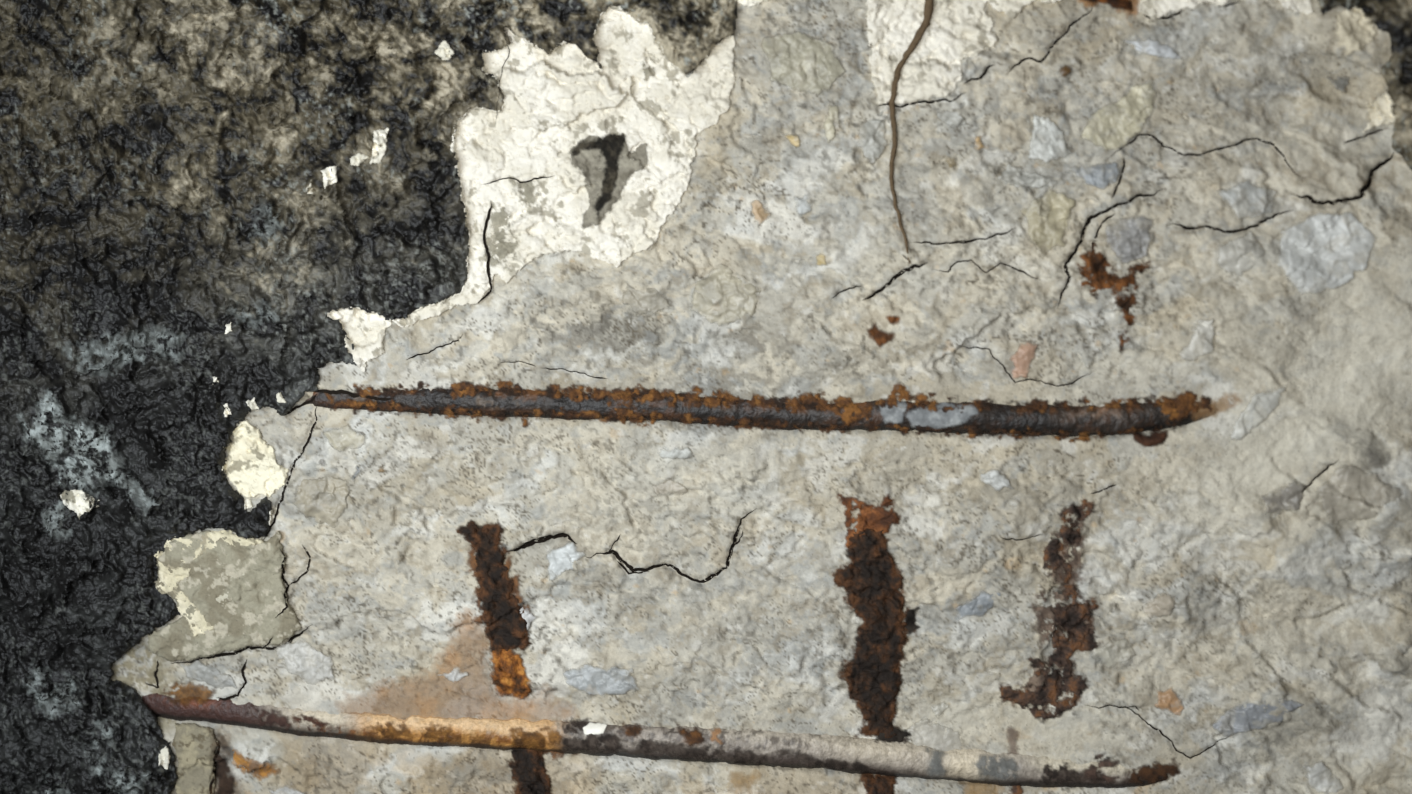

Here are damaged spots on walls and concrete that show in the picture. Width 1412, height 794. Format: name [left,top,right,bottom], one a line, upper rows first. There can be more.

crack [878,5,1093,108]
peeling [392,6,736,327]
crack [833,128,1394,308]
corrosion [1077,244,1150,352]
damp [69,329,178,373]
corrosion [326,381,1211,447]
damp [17,391,155,538]
crack [507,508,757,583]
damp [91,720,148,794]
spalling [158,717,517,794]
corrosion [510,719,875,772]
spalling [542,752,875,794]